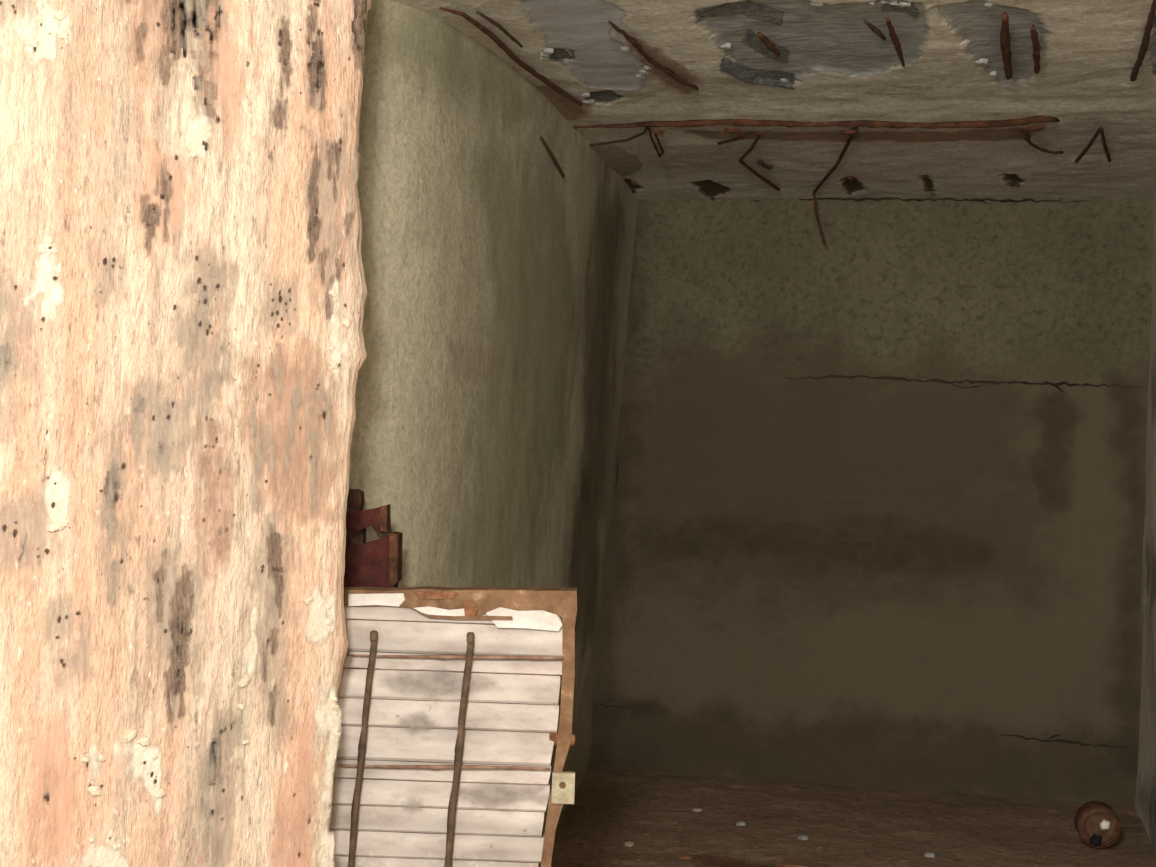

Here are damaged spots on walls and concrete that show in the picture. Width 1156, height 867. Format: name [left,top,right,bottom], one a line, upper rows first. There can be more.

leakage [136,0,240,122]
leakage [273,18,293,127]
leakage [306,0,327,110]
spalling [523,0,652,104]
spalling [573,116,1060,135]
spalling [695,0,1048,90]
leakage [140,152,182,252]
leakage [306,138,357,319]
crack [779,375,1141,393]
leakage [148,550,198,722]
leakage [257,519,291,736]
crack [999,734,1133,749]